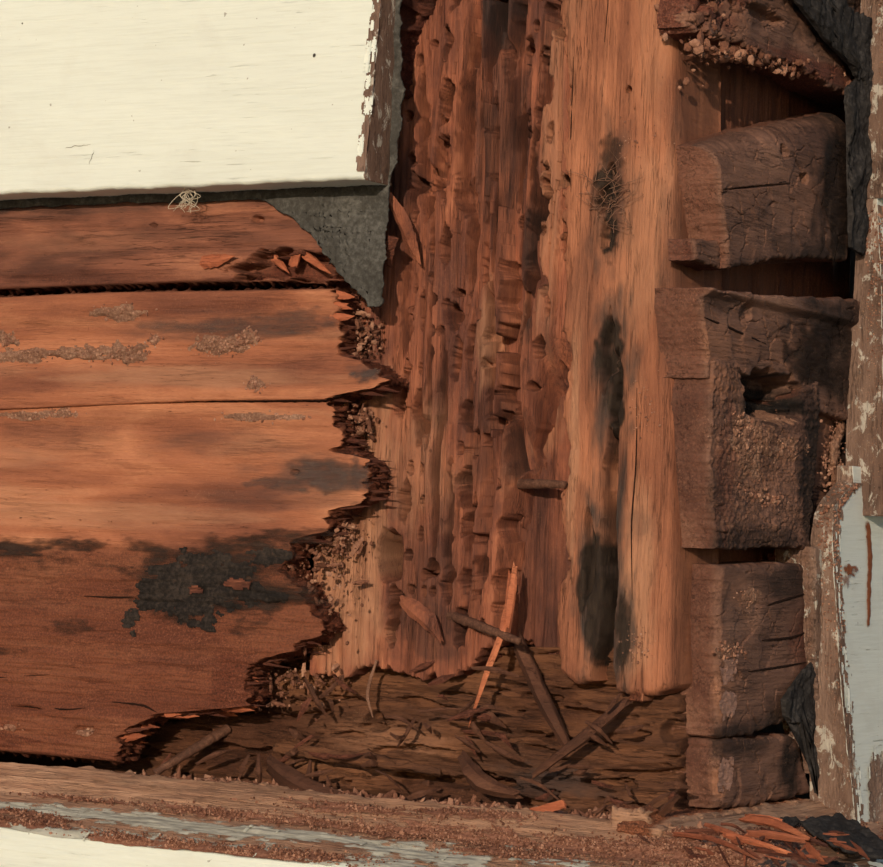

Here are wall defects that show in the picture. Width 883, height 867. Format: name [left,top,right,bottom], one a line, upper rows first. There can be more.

peeling [356,0,381,172]
crack [721,181,786,193]
leakage [594,319,625,440]
leakage [0,539,101,557]
leakage [121,529,324,637]
leakage [576,528,630,668]
rust [843,522,873,626]
spalling [719,653,739,722]
peeling [816,482,883,824]
spalling [717,757,734,794]
peeling [0,802,594,867]